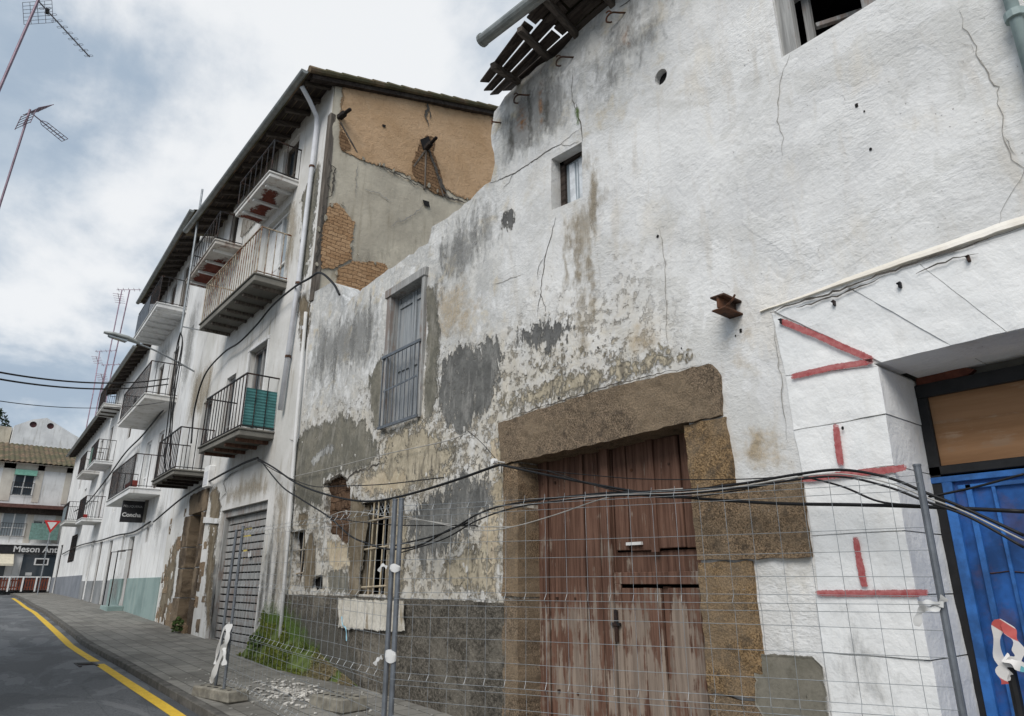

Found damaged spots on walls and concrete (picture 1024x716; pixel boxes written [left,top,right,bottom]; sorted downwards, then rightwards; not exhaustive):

spalling [297,164,390,348]
spalling [339,87,495,200]
crack [313,68,582,274]
crack [496,218,556,316]
crack [770,15,1024,442]
flaking render [294,284,693,602]
flaking render [155,538,179,625]
flaking render [203,484,222,630]